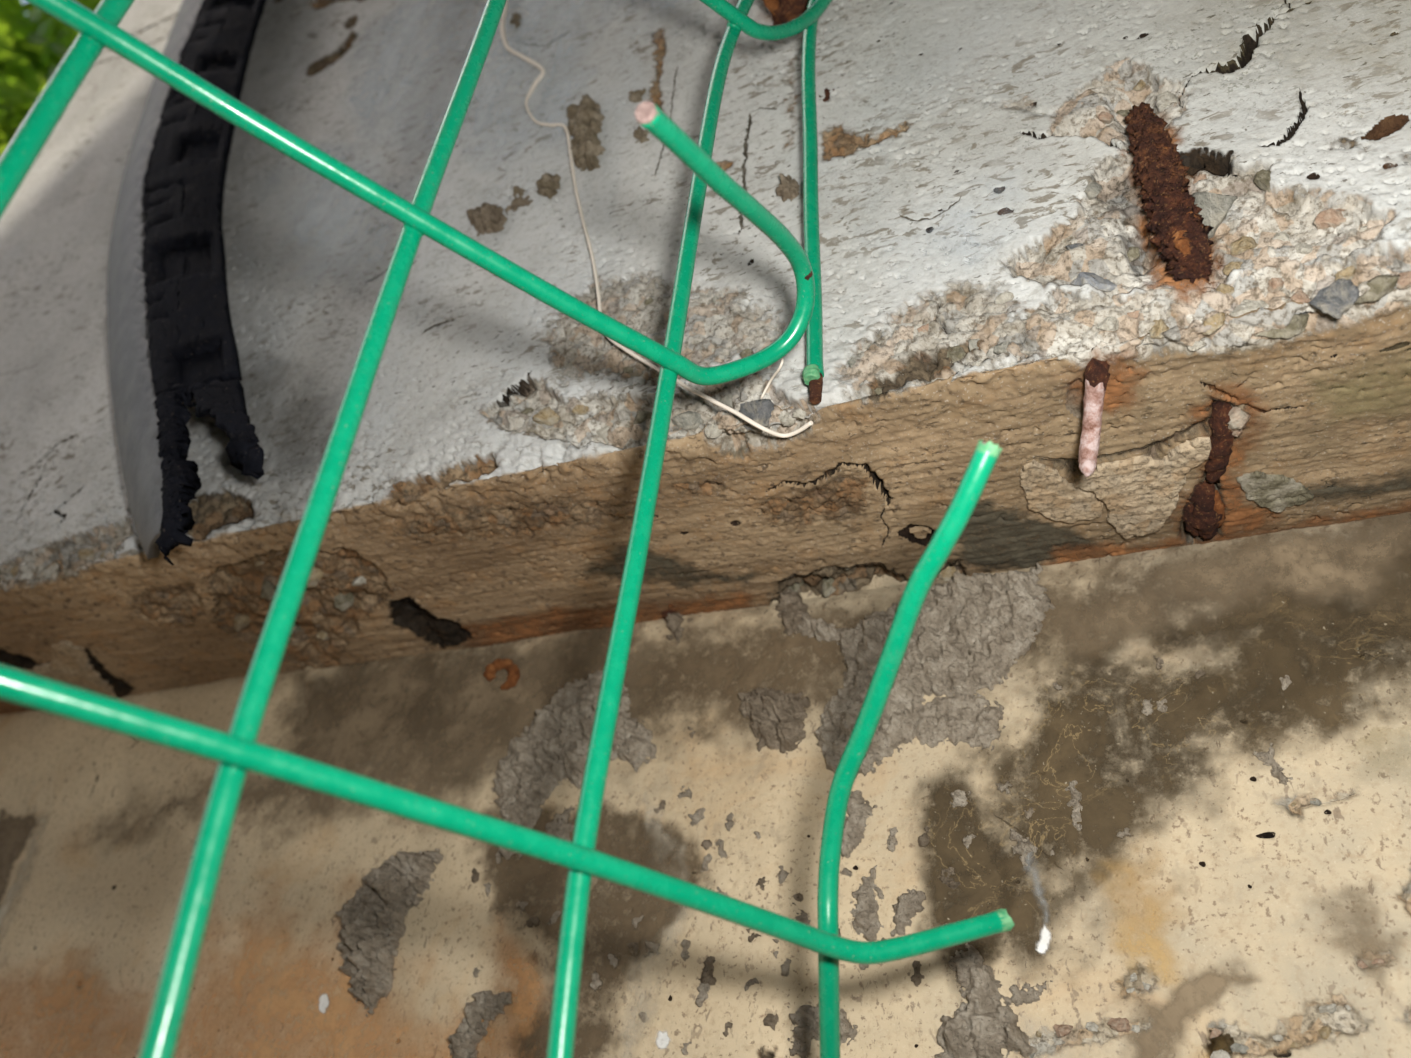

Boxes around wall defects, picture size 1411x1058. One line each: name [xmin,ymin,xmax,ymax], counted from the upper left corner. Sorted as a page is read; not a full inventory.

crack [1179,0,1295,108]
crack [1179,88,1308,177]
spalling [837,58,1411,405]
rust [1125,102,1221,301]
spalling [575,271,673,346]
spalling [480,312,660,449]
spalling [667,372,820,459]
rust [1103,358,1136,411]
rust [1052,388,1411,565]
water stain [959,501,1091,569]
water stain [923,537,1411,977]
water stain [0,810,46,926]